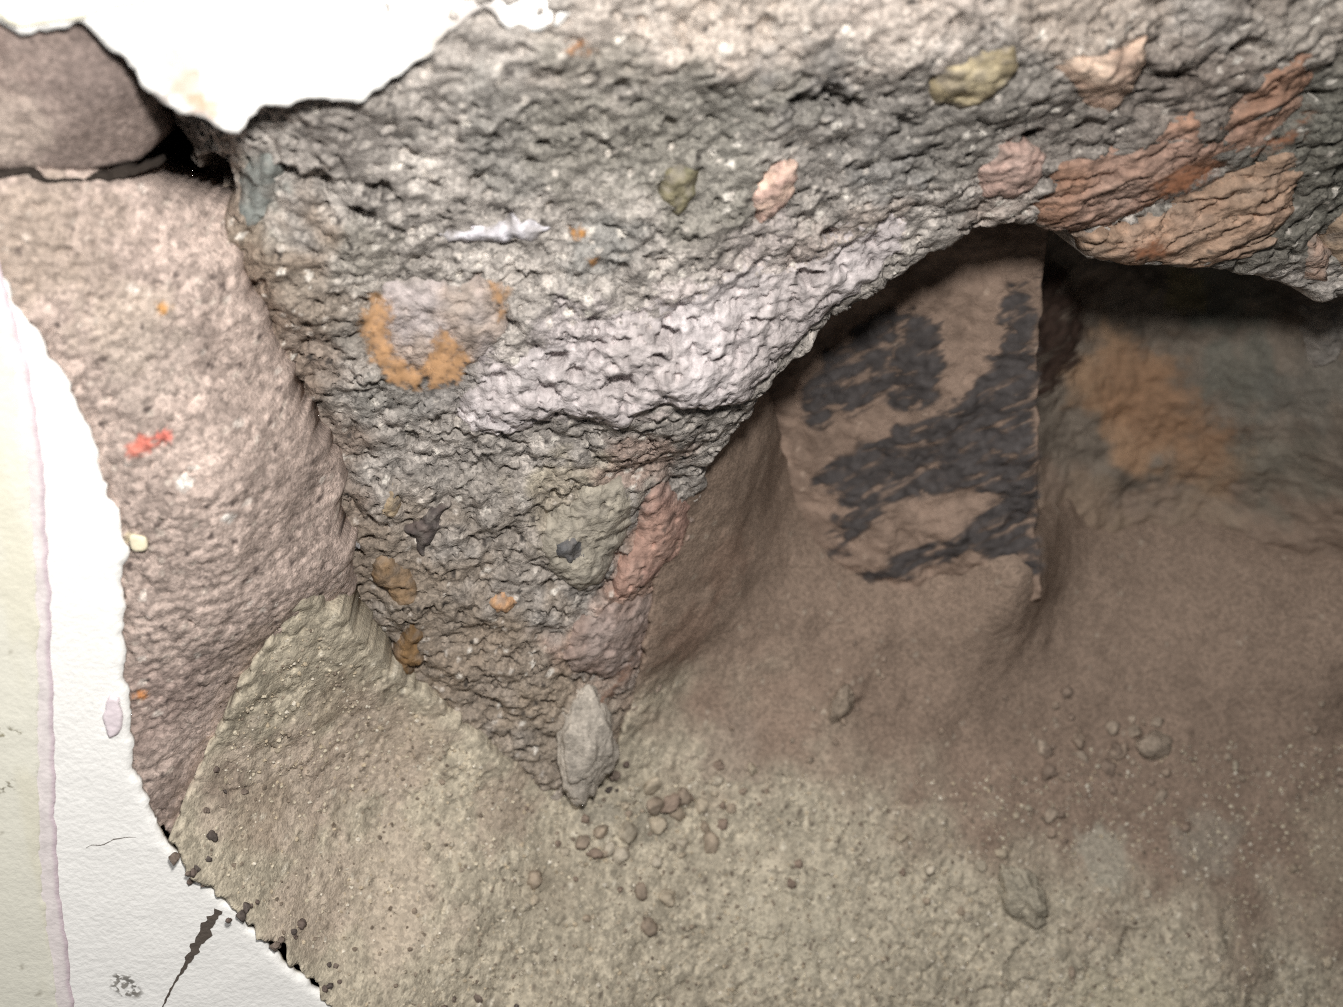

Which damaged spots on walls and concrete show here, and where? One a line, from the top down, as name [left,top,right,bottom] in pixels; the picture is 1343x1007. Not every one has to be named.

spalling [0,155,358,1007]
rust [362,296,470,391]
spalling [0,0,1343,801]
damp [802,365,852,426]
damp [812,284,1044,582]
crack [162,908,223,1007]